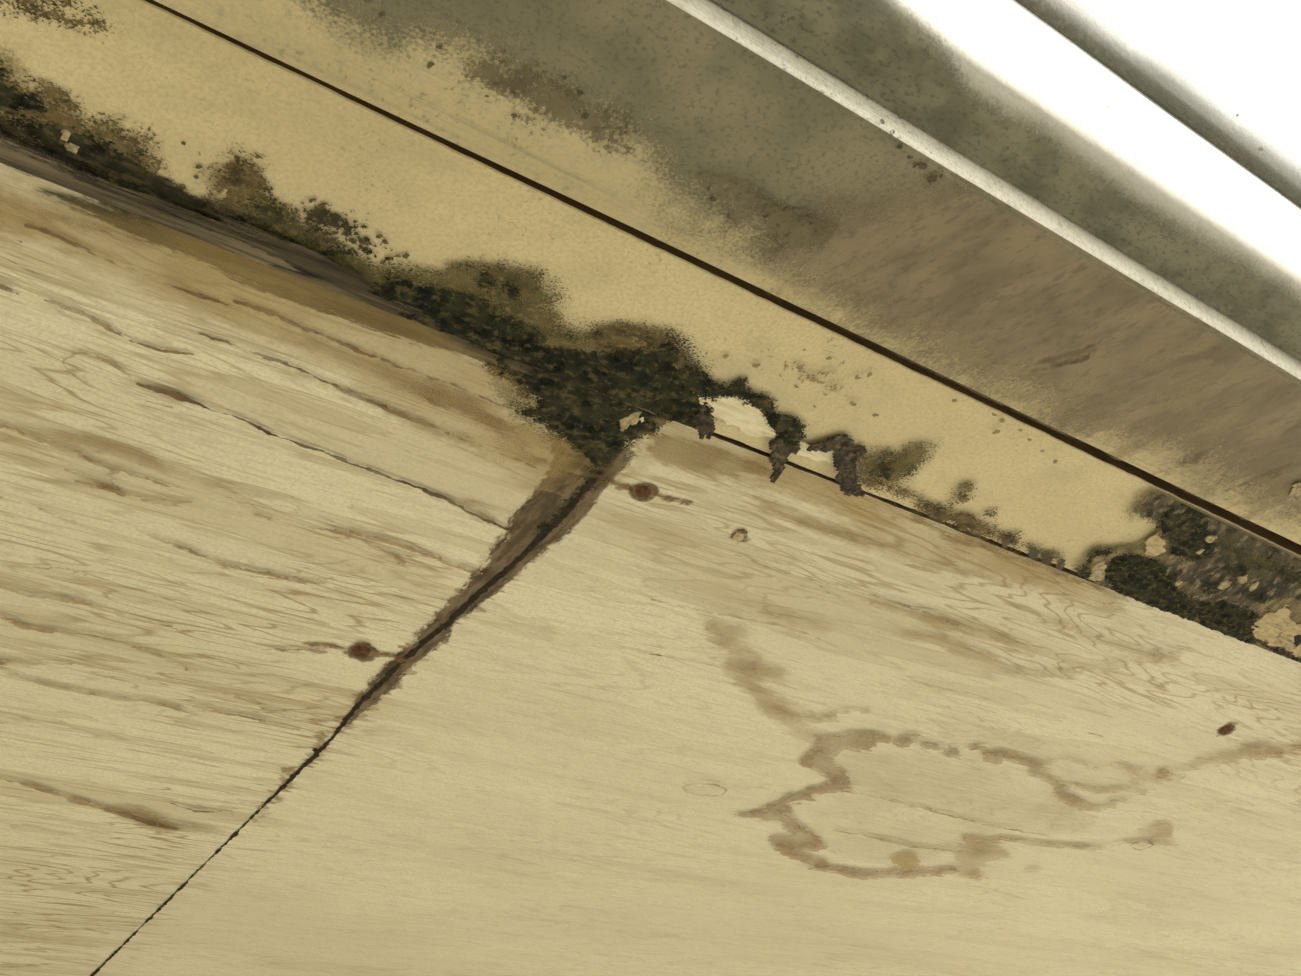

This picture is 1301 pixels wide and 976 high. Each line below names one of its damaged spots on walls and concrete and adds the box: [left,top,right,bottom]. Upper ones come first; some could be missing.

leakage [0,0,115,43]
leakage [0,50,731,468]
crack [169,284,296,324]
crack [0,424,193,503]
rust [598,475,692,505]
leakage [855,437,1301,663]
crack [2,598,188,696]
crack [67,316,634,976]
rust [304,642,414,663]
peeling [1241,604,1301,657]
rust [1216,723,1238,737]
leakage [736,774,959,880]